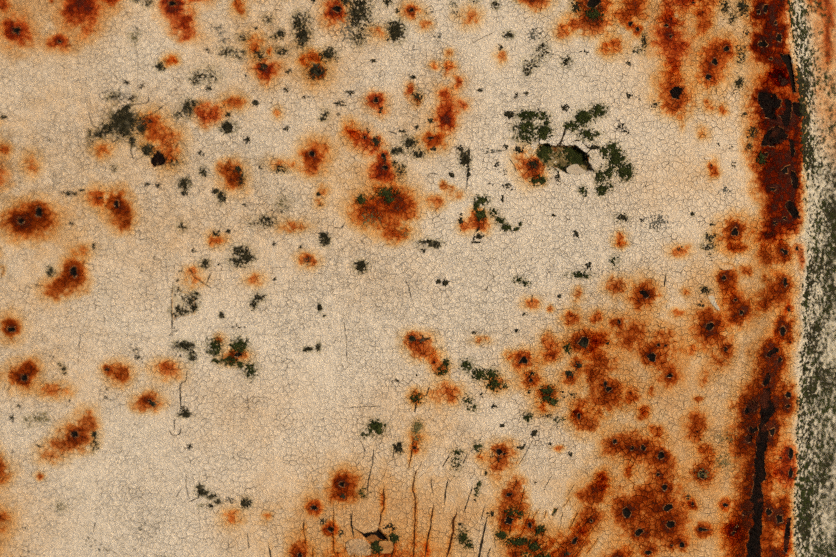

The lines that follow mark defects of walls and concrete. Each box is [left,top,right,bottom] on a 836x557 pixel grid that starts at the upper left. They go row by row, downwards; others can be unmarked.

rust [654,0,715,114]
peeling [531,134,593,175]
crack [550,124,594,172]
rust [748,0,805,265]
rust [0,201,56,239]
crack [170,372,187,436]
rust [564,313,697,557]
rust [689,267,797,557]
crack [303,507,355,557]
peeling [346,502,394,557]
crack [361,439,598,557]
rust [497,473,608,557]